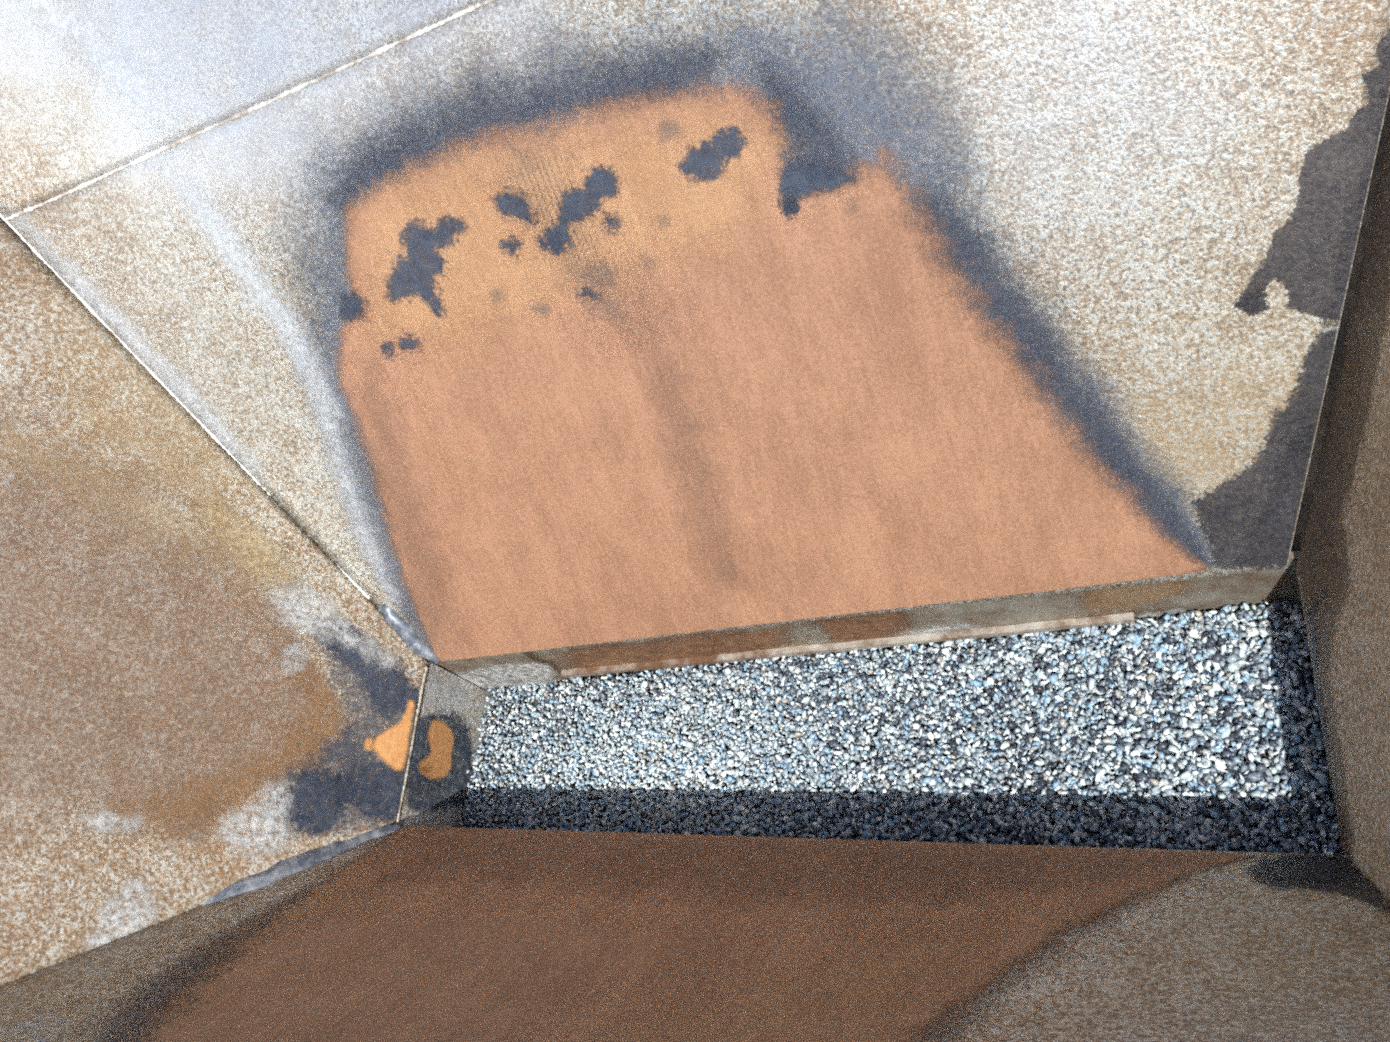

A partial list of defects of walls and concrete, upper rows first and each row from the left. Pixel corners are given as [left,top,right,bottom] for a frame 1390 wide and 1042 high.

damp [29,0,173,127]
damp [35,235,238,447]
rust [338,83,1205,669]
damp [155,2,1390,909]
efflorescence [86,812,138,831]
efflorescence [88,881,155,949]
rust [365,700,454,779]
rust [142,826,1251,1042]